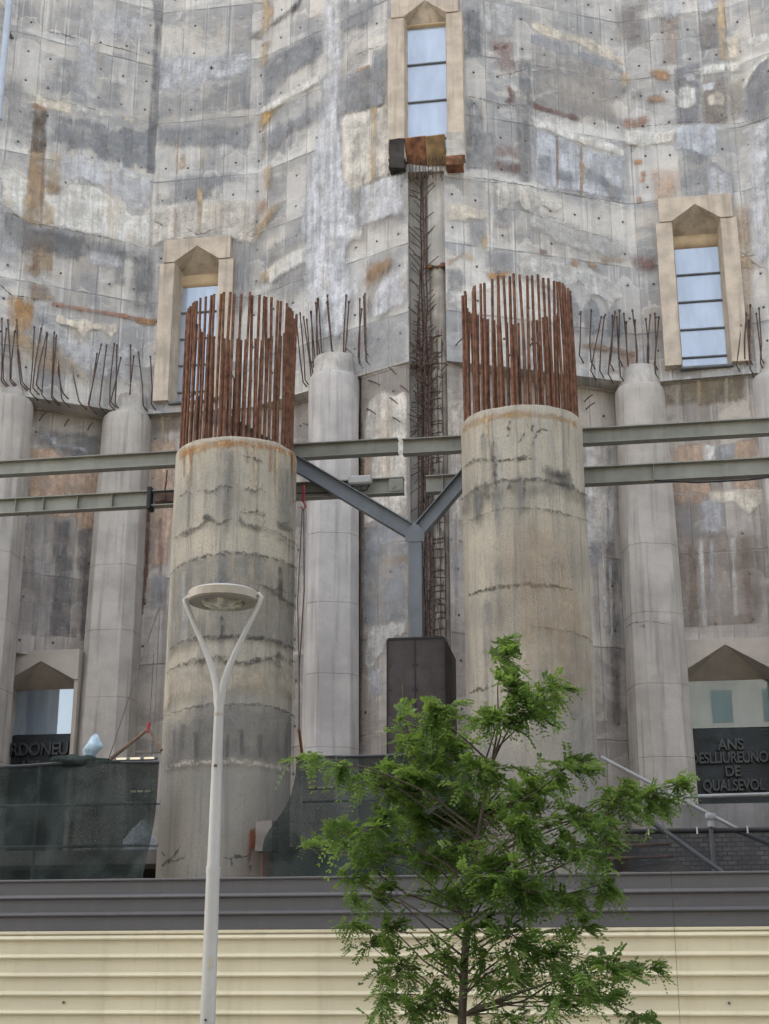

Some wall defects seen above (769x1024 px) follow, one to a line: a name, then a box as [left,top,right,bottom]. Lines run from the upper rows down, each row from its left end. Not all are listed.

leakage [0,2,255,267]
corrosion [534,103,579,120]
corrosion [24,104,59,271]
corrosion [11,285,155,348]
corrosion [181,441,296,496]
crack [462,421,589,524]
crack [170,485,297,608]
crack [469,582,573,596]
leakage [680,516,759,627]
crack [167,614,296,674]